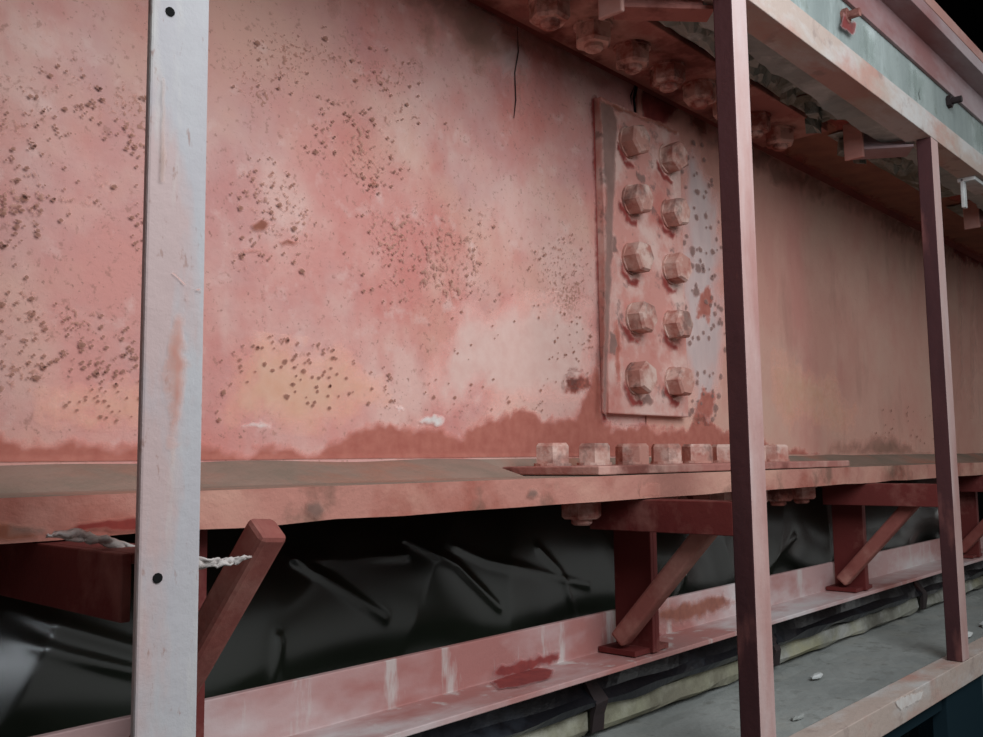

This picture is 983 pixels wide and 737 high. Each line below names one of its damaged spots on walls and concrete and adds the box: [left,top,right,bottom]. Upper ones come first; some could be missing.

crack [512,27,520,116]
spalling [659,21,715,58]
corrosion [305,95,410,195]
spalling [748,54,919,191]
corrosion [0,193,43,248]
corrosion [231,157,308,273]
spalling [940,183,963,217]
corrosion [0,296,130,380]
peeling [201,140,730,460]
peeling [0,436,138,462]
peeling [896,691,923,710]